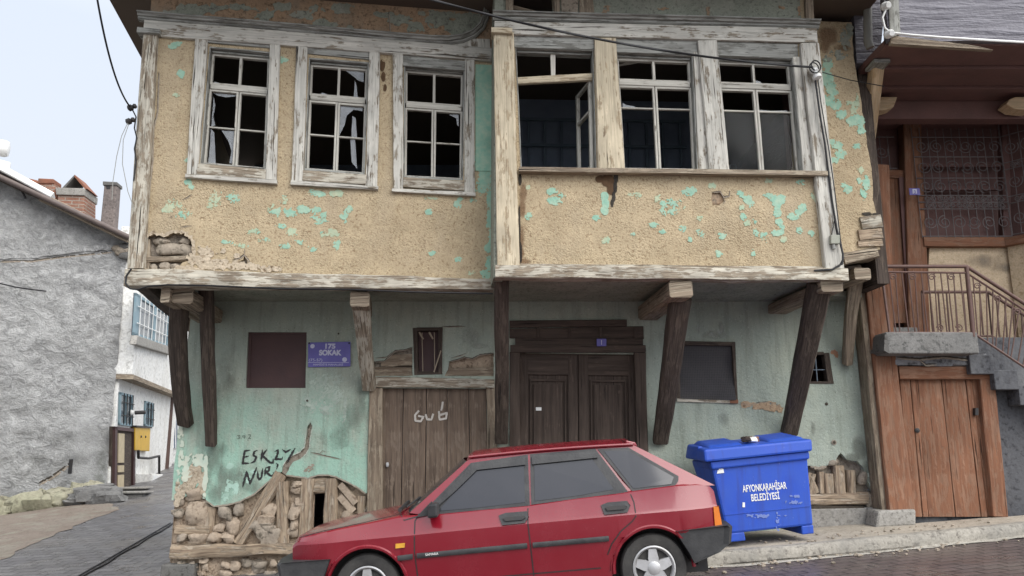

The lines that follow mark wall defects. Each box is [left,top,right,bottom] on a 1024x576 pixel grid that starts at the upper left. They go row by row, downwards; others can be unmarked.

peeling [822,23,866,164]
spalling [146,189,353,273]
peeling [648,178,816,256]
peeling [841,166,871,201]
spalling [374,348,413,376]
spalling [445,354,494,376]
spalling [169,423,367,576]
spalling [808,441,872,509]